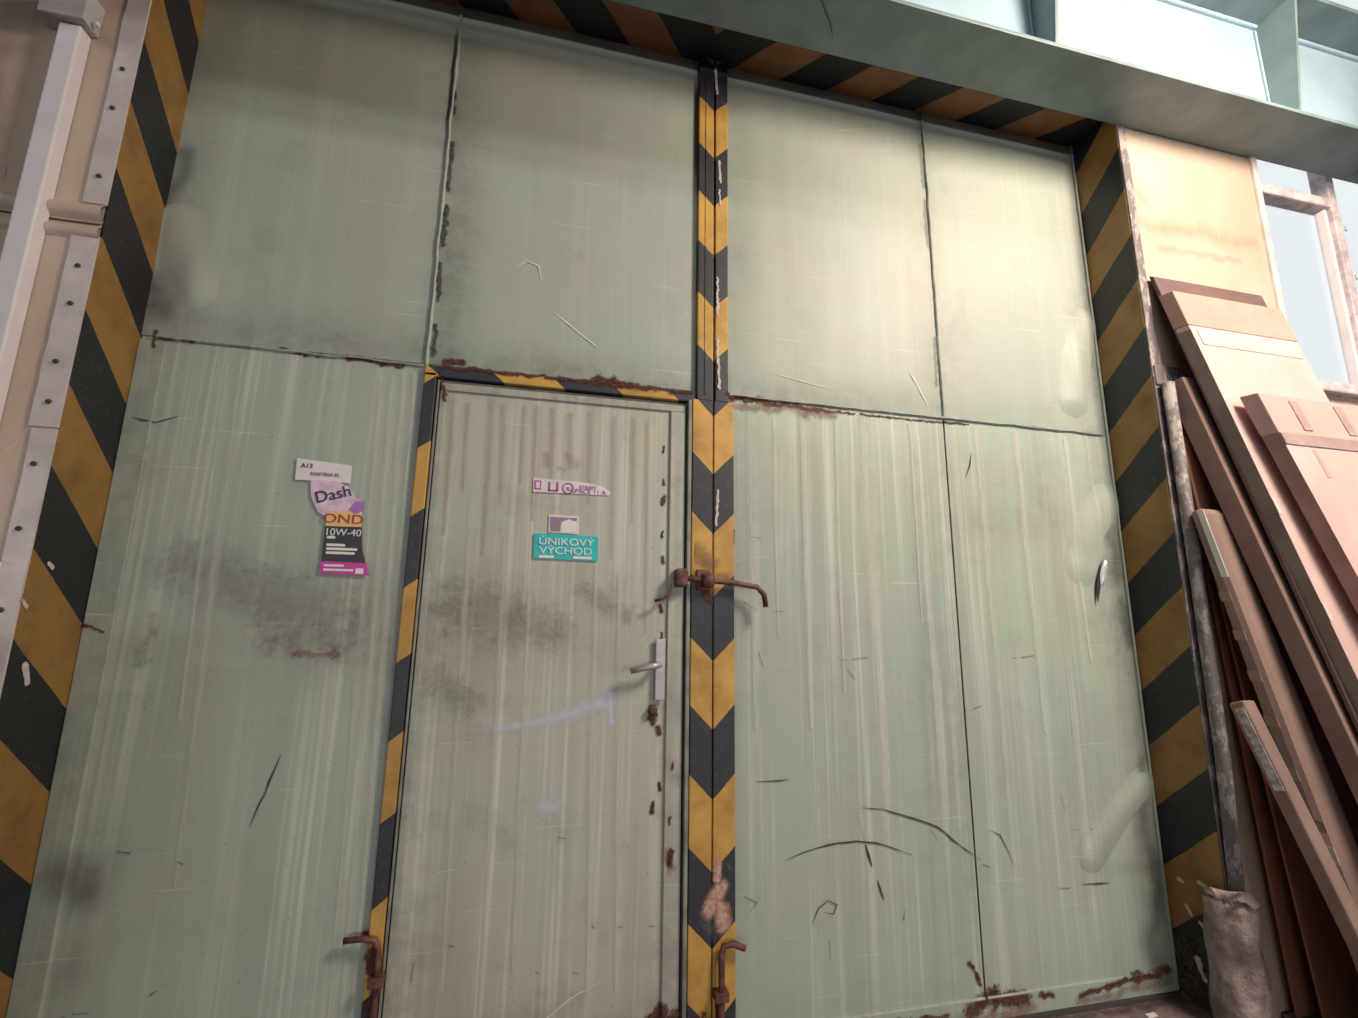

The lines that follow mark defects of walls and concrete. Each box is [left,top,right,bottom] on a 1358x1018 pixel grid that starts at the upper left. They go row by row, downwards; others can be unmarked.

rust [439,358,693,401]
rust [727,391,969,425]
rust [363,947,384,1018]
rust [645,1002,718,1018]
rust [910,961,1055,1018]
rust [1079,965,1172,1002]